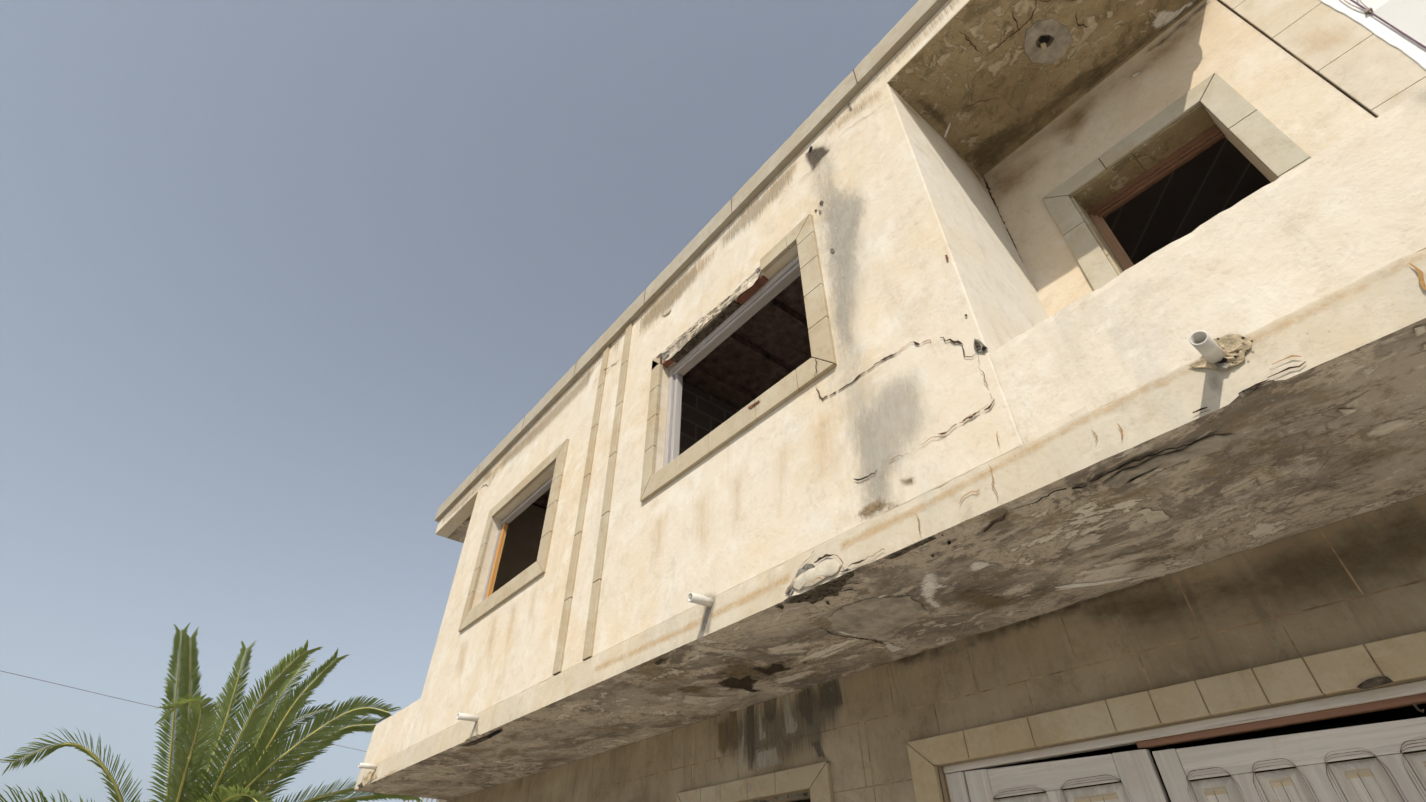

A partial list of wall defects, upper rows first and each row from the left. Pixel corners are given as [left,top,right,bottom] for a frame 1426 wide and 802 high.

crack [959,0,1087,56]
peeling [1153,1,1193,28]
damp [806,147,828,169]
flaking render [1188,334,1253,370]
spalling [1238,355,1306,398]
damp [859,387,913,516]
crack [814,337,1009,533]
peeling [1013,431,1235,510]
spalling [776,537,936,610]
peeling [767,641,812,655]
spalling [462,729,503,746]
damp [678,662,842,789]